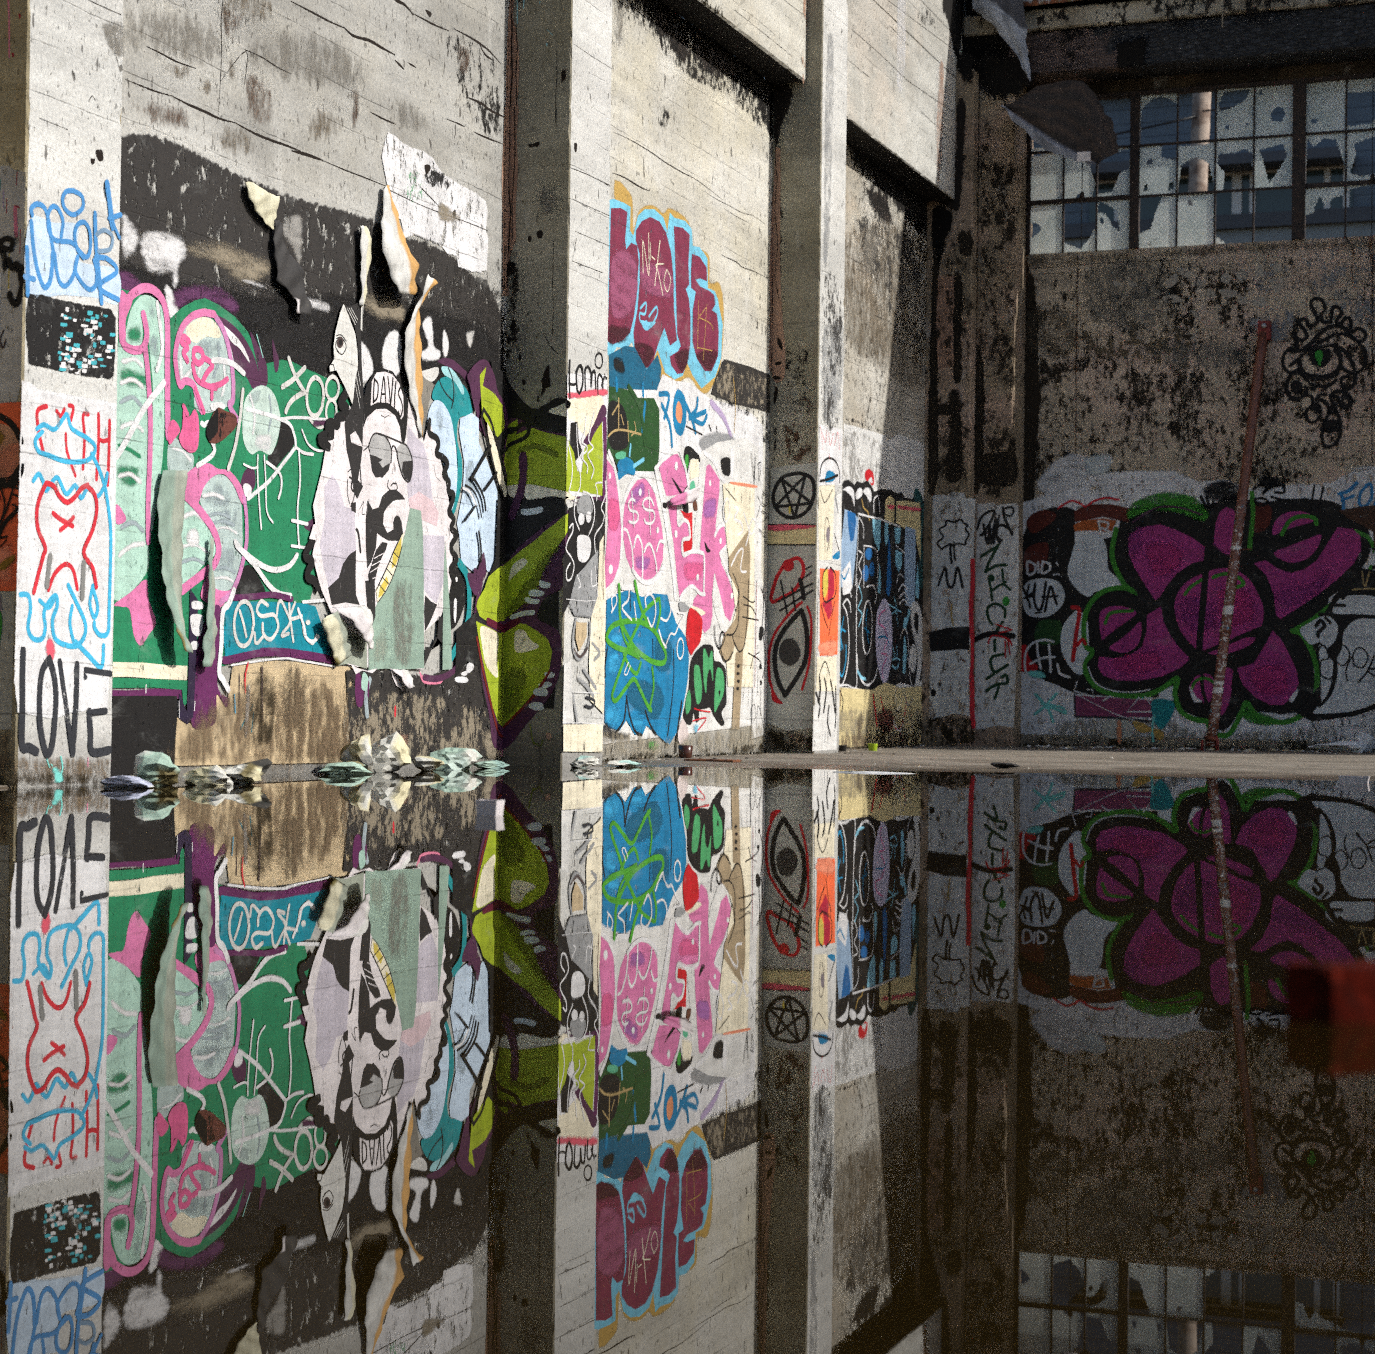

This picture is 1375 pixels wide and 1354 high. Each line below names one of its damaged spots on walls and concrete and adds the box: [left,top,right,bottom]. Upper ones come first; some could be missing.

crack [291,0,416,69]
crack [395,0,501,64]
crack [125,3,385,186]
crack [447,96,504,144]